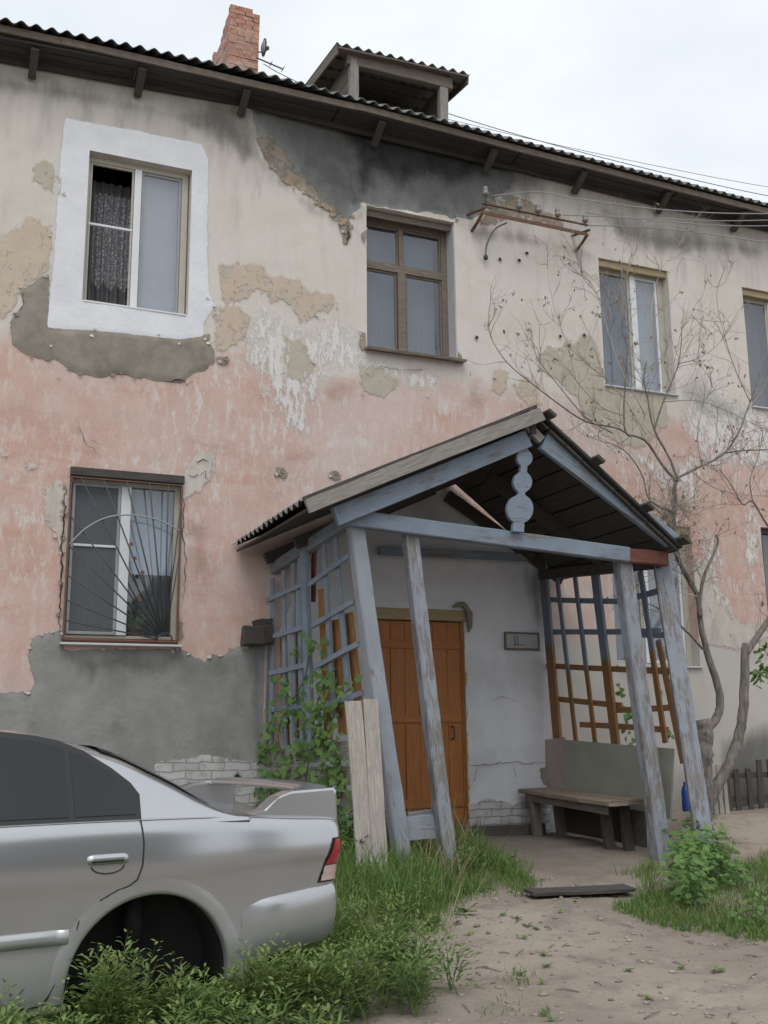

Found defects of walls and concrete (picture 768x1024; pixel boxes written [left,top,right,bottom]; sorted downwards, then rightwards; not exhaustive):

peeling [32,160,65,195]
spalling [252,109,563,246]
leakage [284,117,532,199]
peeling [0,216,52,318]
peeling [204,260,439,436]
peeling [536,333,768,503]
peeling [182,449,217,499]
peeling [42,479,69,554]
flaking render [154,754,270,806]
flaking render [469,799,551,833]